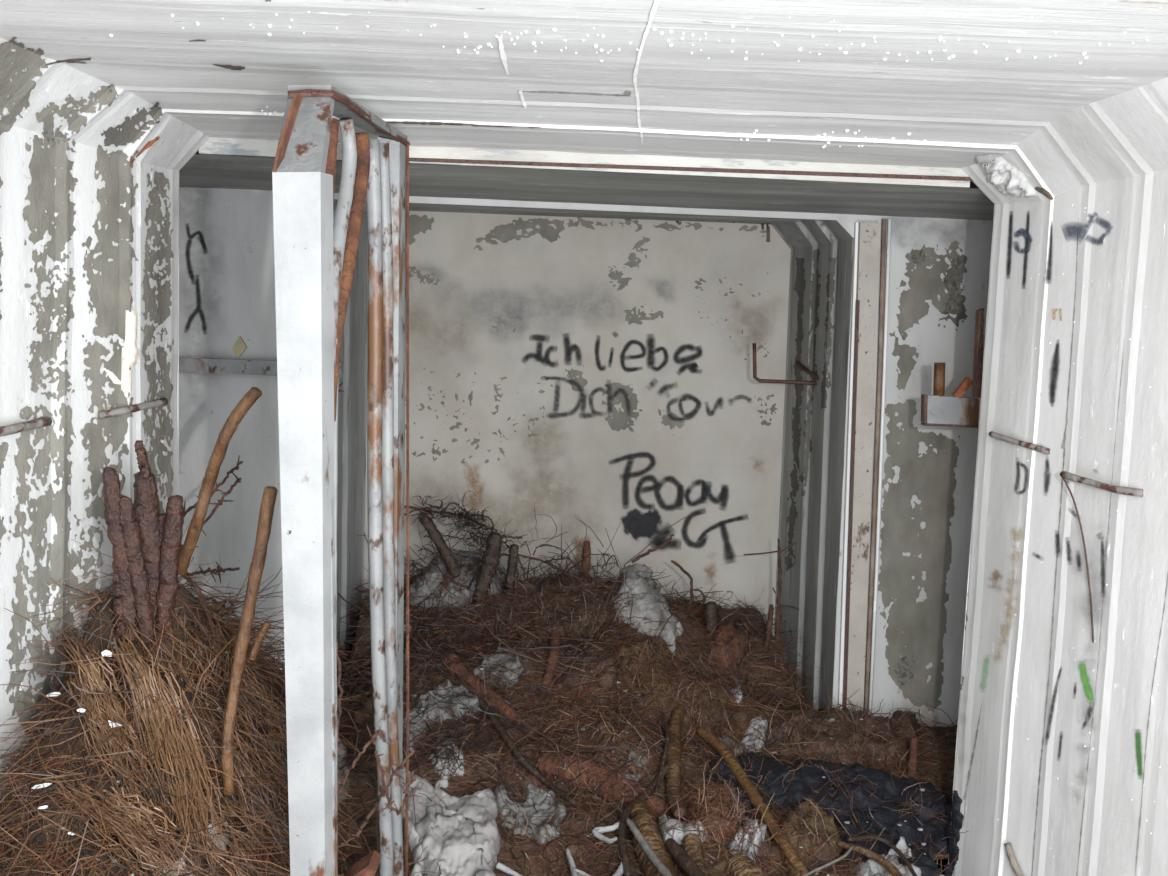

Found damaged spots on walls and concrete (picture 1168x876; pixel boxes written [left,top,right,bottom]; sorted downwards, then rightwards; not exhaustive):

crack [385,0,659,145]
rust [273,94,303,172]
peeling [409,214,434,245]
peeling [474,216,766,291]
peeling [624,304,664,325]
peeling [695,277,768,325]
peeling [0,37,174,738]
peeling [405,368,553,464]
peeling [565,365,588,392]
peeling [601,382,642,433]
peeling [878,241,968,713]
spalling [989,431,1050,455]